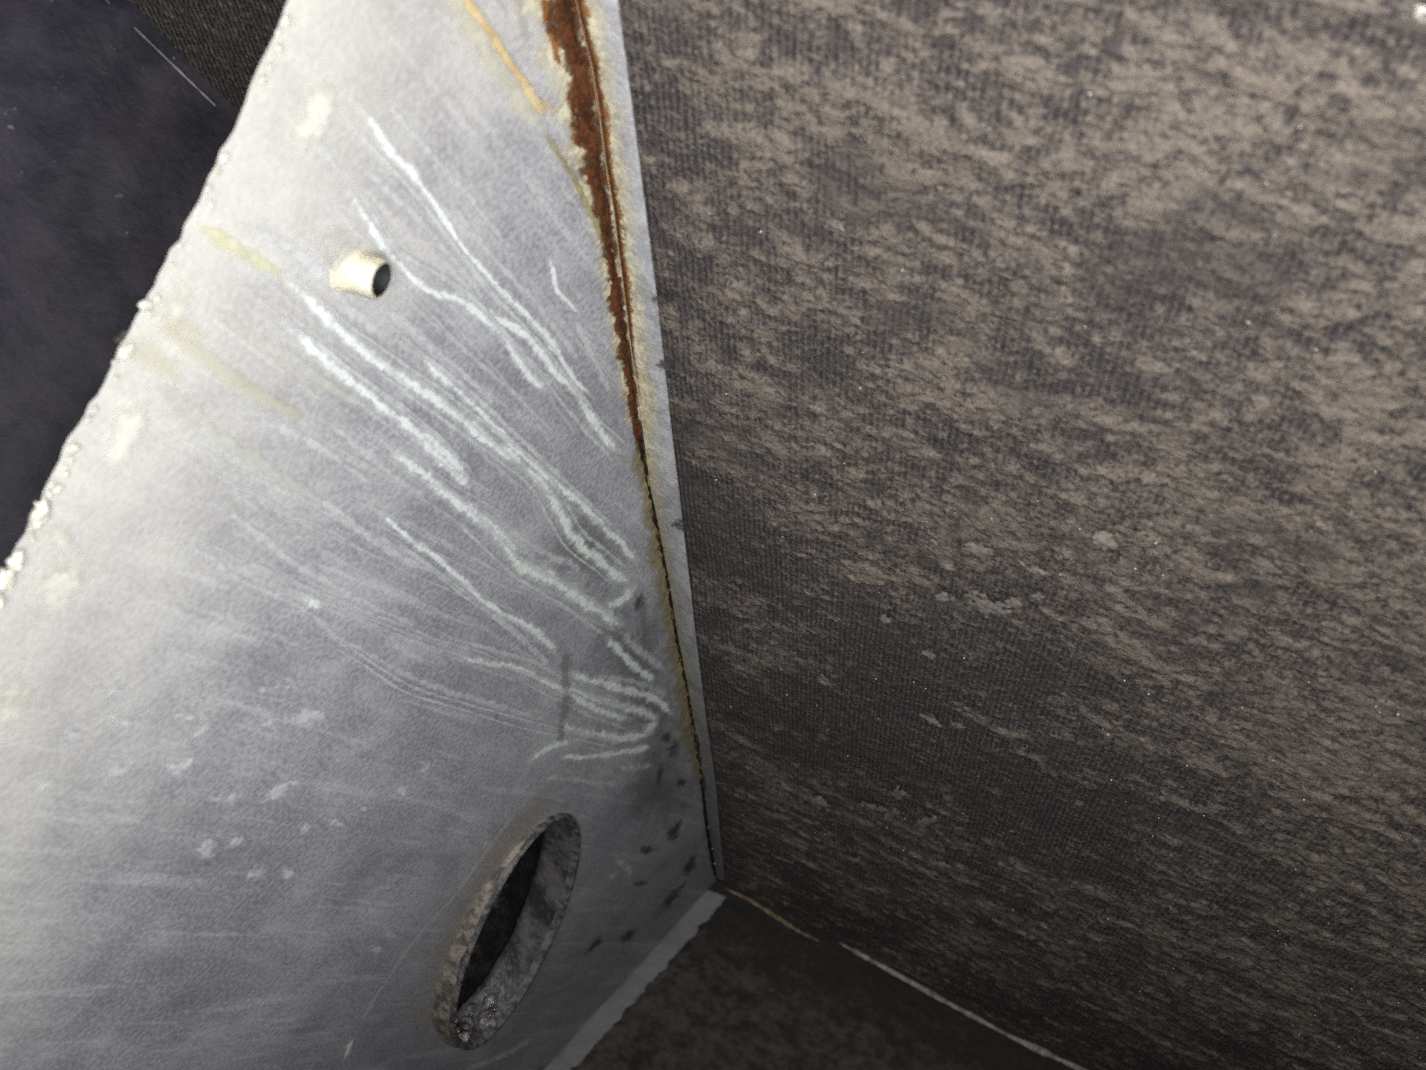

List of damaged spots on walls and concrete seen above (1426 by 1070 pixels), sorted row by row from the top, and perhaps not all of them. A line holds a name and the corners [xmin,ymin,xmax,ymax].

damp [259,16,291,86]
damp [299,90,338,168]
damp [138,283,193,322]
damp [112,343,135,382]
corrosion [449,0,702,757]
damp [109,413,144,463]
damp [162,103,677,787]
damp [0,444,81,612]